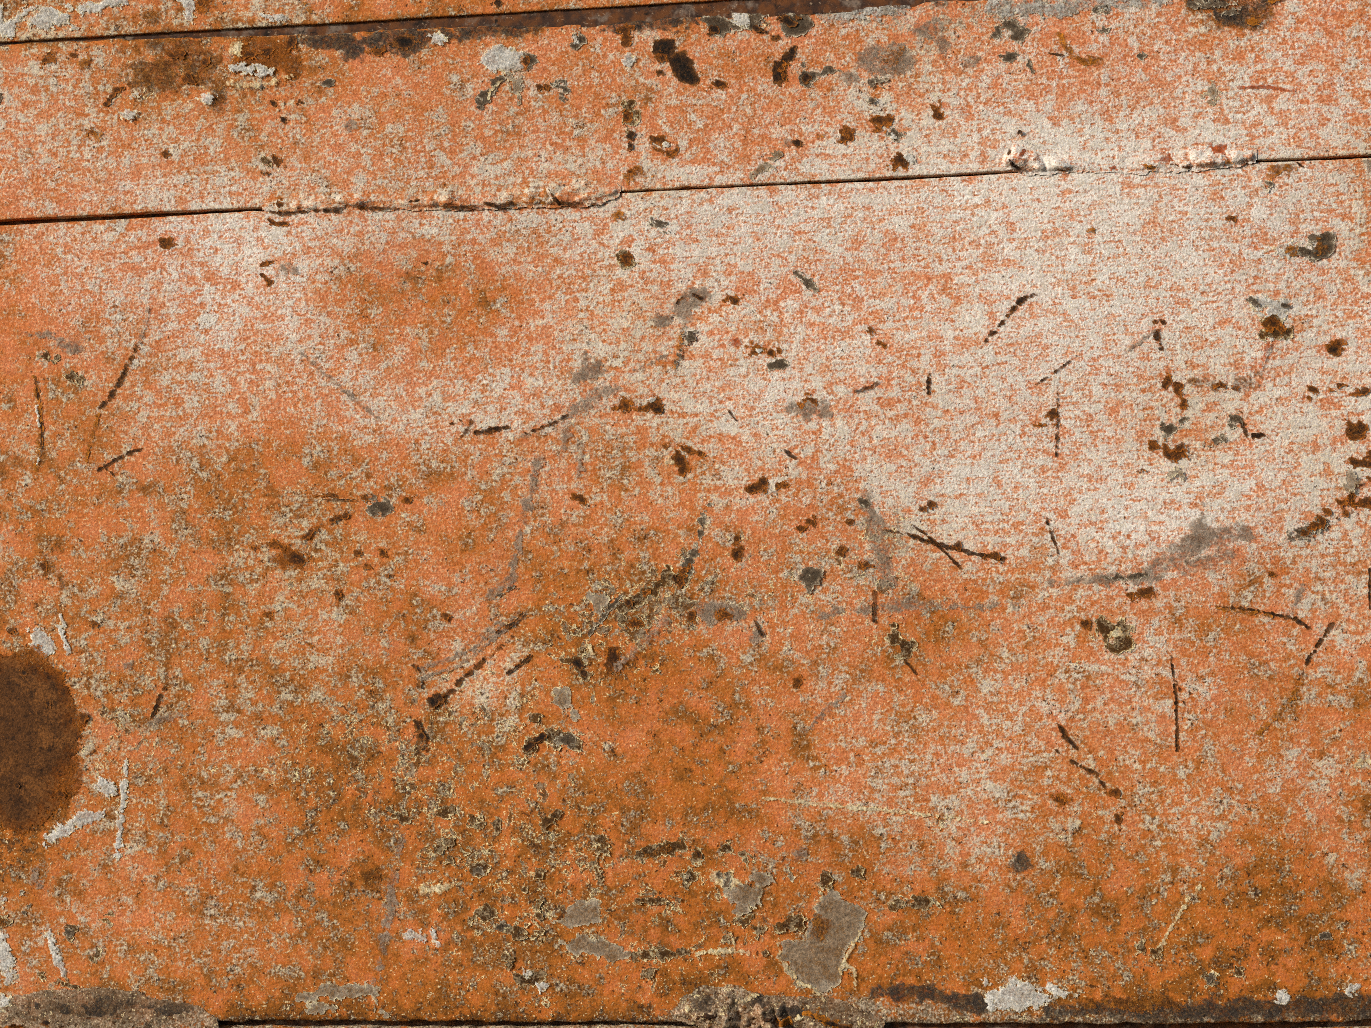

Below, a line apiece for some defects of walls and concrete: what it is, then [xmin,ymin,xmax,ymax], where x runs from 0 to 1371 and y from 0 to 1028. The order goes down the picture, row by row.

rust [1184,0,1281,32]
rust [1324,337,1348,356]
rust [1303,383,1370,402]
rust [1340,418,1369,441]
rust [730,533,748,562]
rust [1123,586,1156,604]
rust [0,627,88,844]
peeling [384,804,414,826]
peeling [539,808,563,834]
peeling [433,800,505,881]
peeling [467,829,868,1021]
peeling [0,892,194,1028]